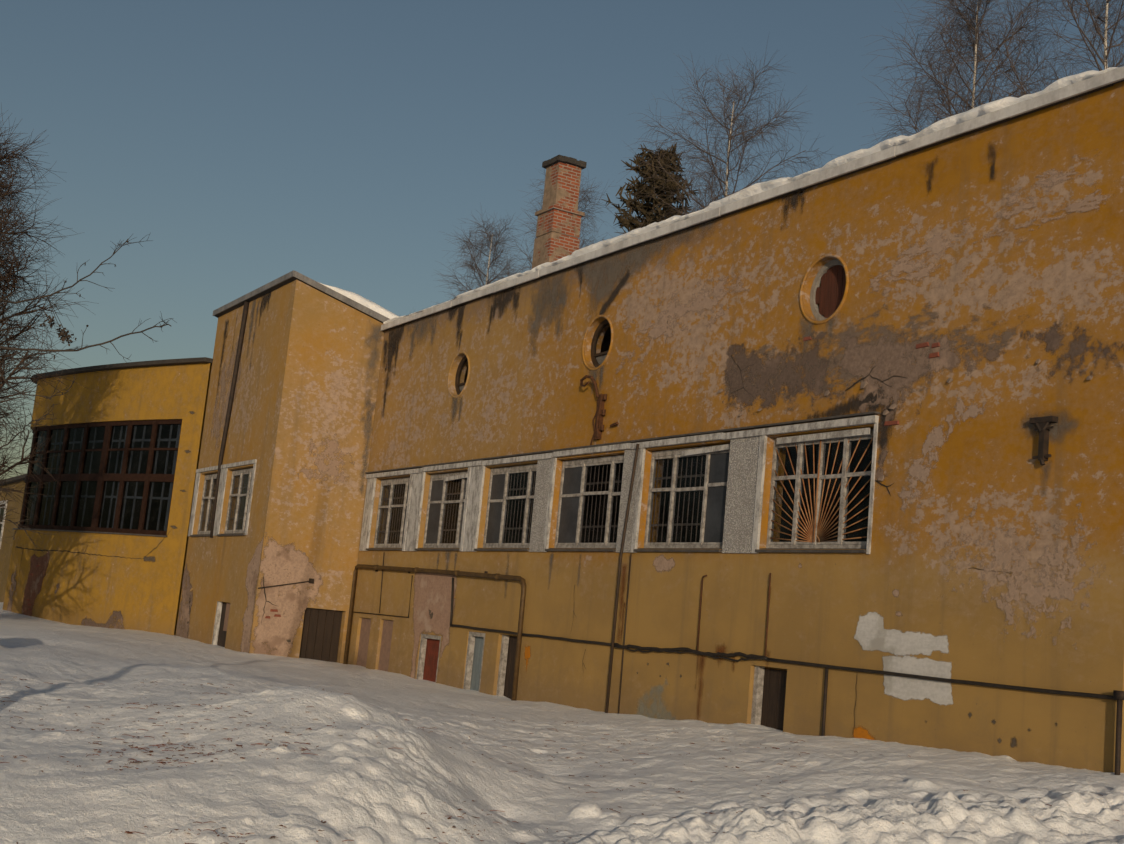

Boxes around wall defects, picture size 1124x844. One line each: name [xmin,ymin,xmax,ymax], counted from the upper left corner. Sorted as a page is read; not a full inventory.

peeling [870,155,1110,297]
spalling [718,303,1123,427]
spalling [875,444,887,481]
peeling [899,397,986,509]